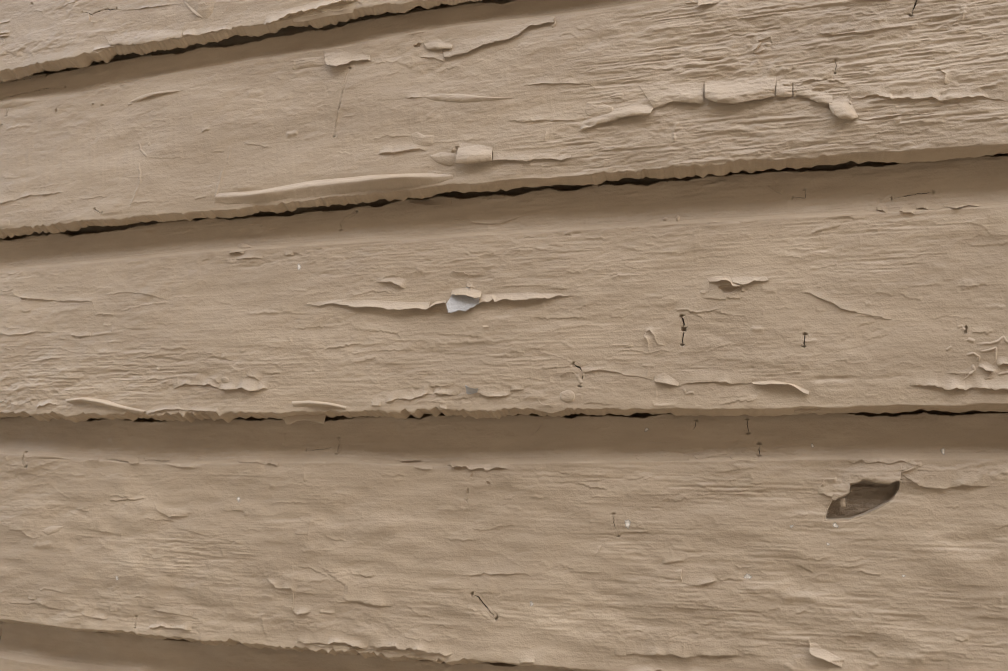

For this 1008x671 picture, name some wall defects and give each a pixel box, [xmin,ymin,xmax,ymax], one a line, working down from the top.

peeling [274,49,370,80]
peeling [583,76,858,130]
peeling [430,143,571,166]
peeling [307,287,581,313]
spalling [704,276,768,296]
peeling [910,322,1008,391]
peeling [219,351,269,402]
peeling [0,396,218,414]
spalling [815,453,991,521]